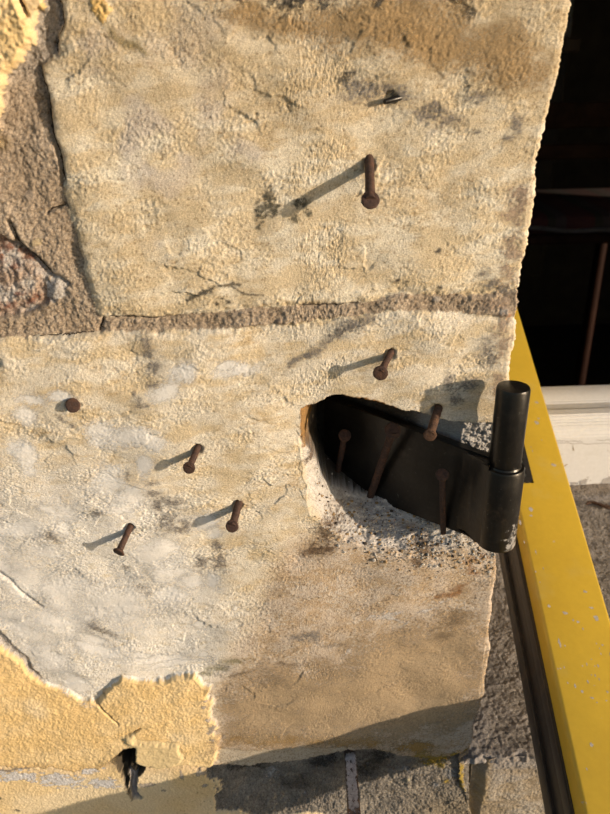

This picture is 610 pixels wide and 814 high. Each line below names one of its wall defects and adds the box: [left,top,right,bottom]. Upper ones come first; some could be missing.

leakage [230,0,548,90]
spalling [12,390,73,426]
spalling [146,363,197,404]
spalling [7,440,40,477]
spalling [85,421,166,478]
spalling [85,462,149,515]
spalling [0,496,223,695]
peeling [0,767,121,789]